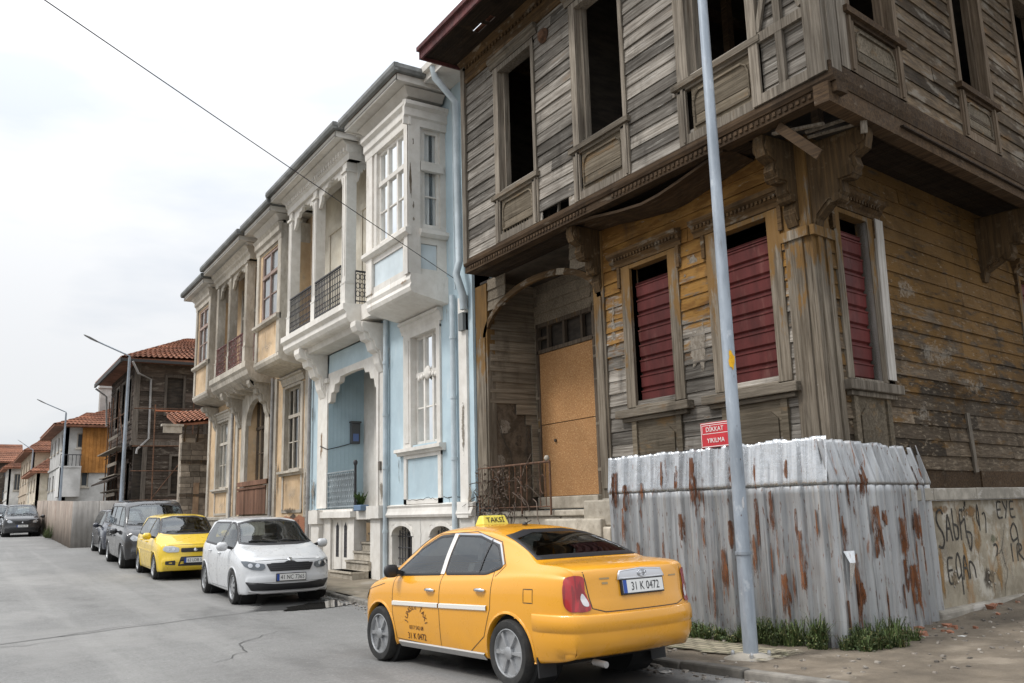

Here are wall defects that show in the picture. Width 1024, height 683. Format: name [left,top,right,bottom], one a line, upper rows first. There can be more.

peeling [689,323,708,370]
rust [610,473,643,556]
rust [660,458,706,550]
rust [707,520,734,618]
rust [752,460,808,621]
rust [837,467,868,632]
rust [870,487,946,619]